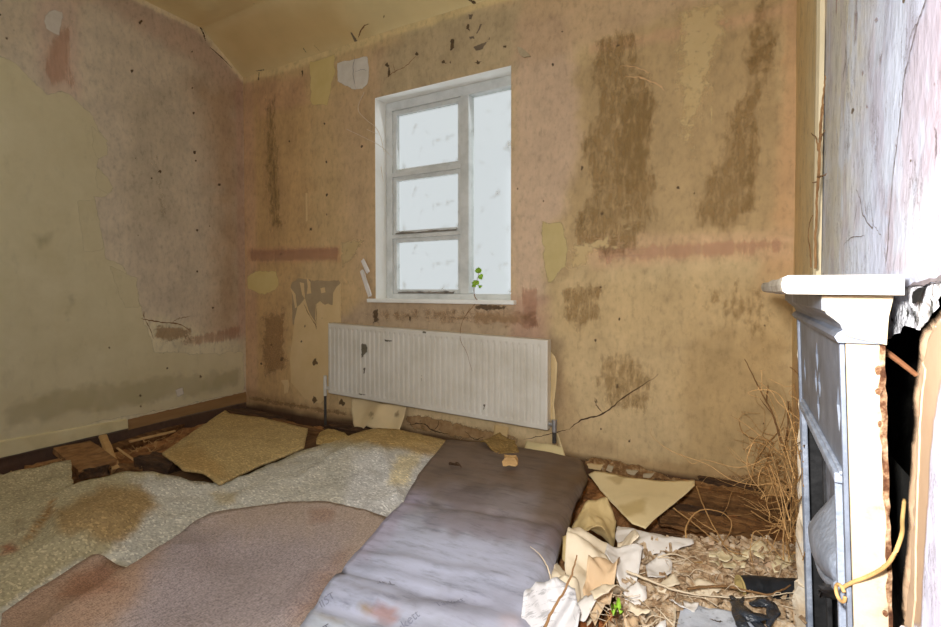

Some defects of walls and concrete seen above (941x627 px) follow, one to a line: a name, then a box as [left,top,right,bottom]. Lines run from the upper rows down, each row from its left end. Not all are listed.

peeling [0,56,245,440]
crack [141,314,189,340]
peeling [281,278,352,408]
crack [527,374,658,439]
water stain [577,35,655,254]
water stain [699,1,772,227]